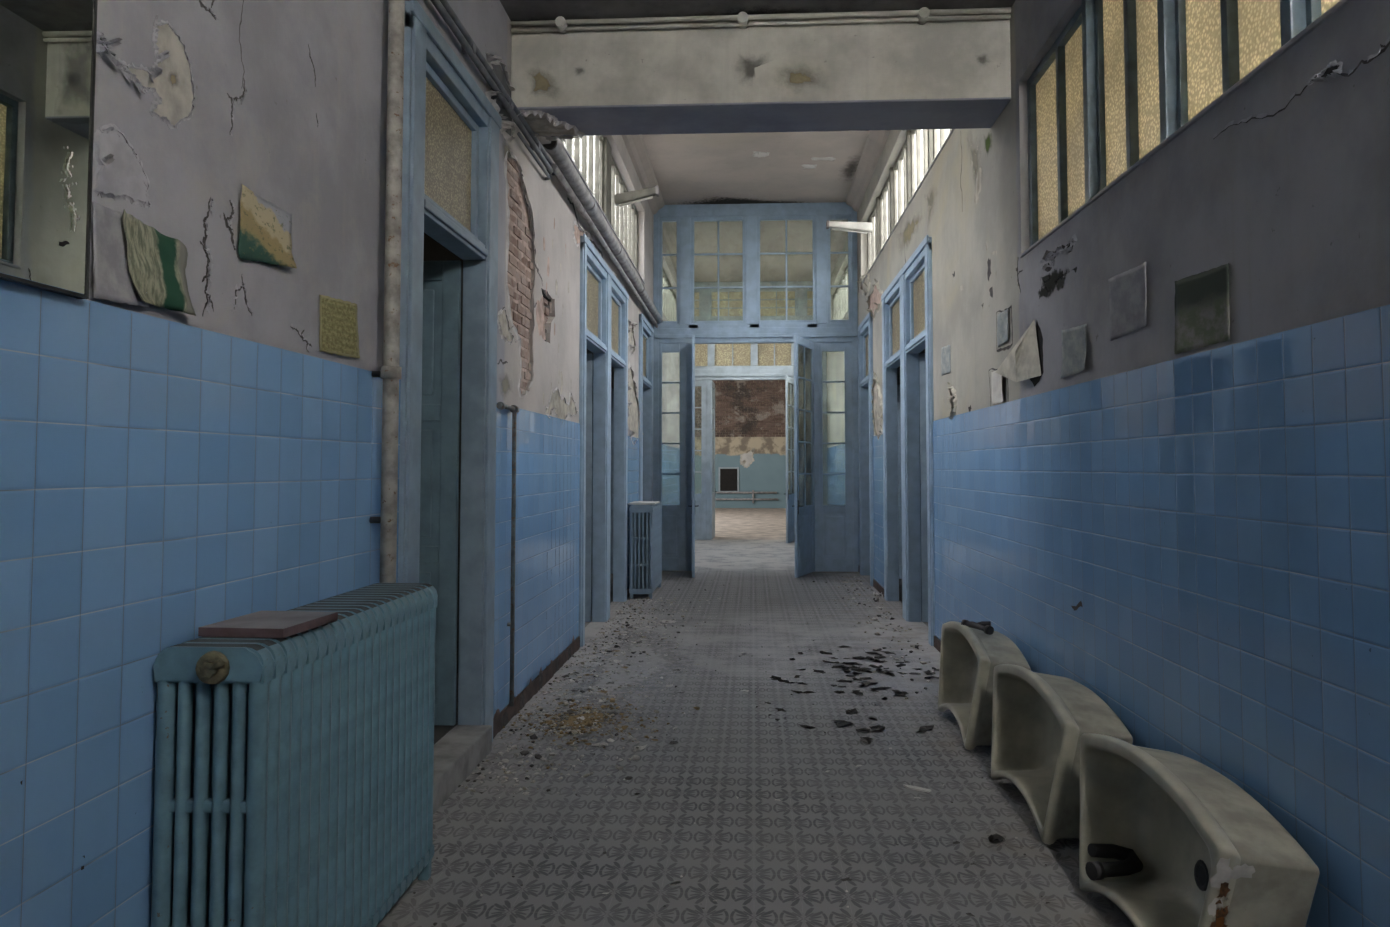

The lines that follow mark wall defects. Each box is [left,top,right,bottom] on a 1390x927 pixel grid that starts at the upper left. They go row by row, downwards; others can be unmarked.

crack [199,0,247,136]
crack [1212,36,1390,139]
peeling [65,124,151,215]
crack [200,197,253,316]
flaking render [485,52,595,398]
peeling [1040,234,1078,272]